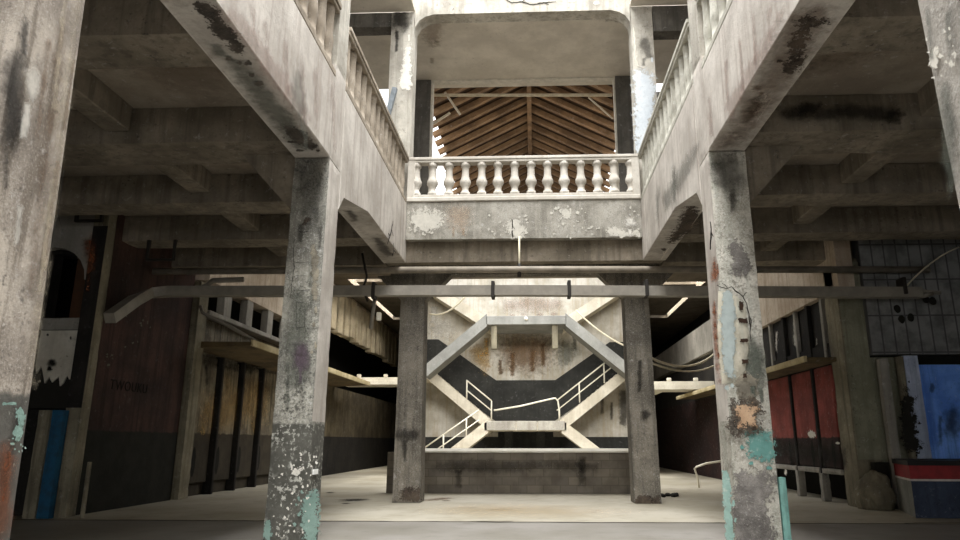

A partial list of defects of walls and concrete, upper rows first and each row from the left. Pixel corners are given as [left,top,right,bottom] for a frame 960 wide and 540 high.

peeling [398,35,413,91]
damp [3,22,39,188]
peeling [630,57,658,153]
damp [784,103,898,123]
peeling [407,206,448,236]
peeling [487,214,529,239]
peeling [550,205,640,239]
crack [717,283,752,339]
peeling [2,402,26,453]
spalling [718,290,787,540]
peeling [263,452,322,540]